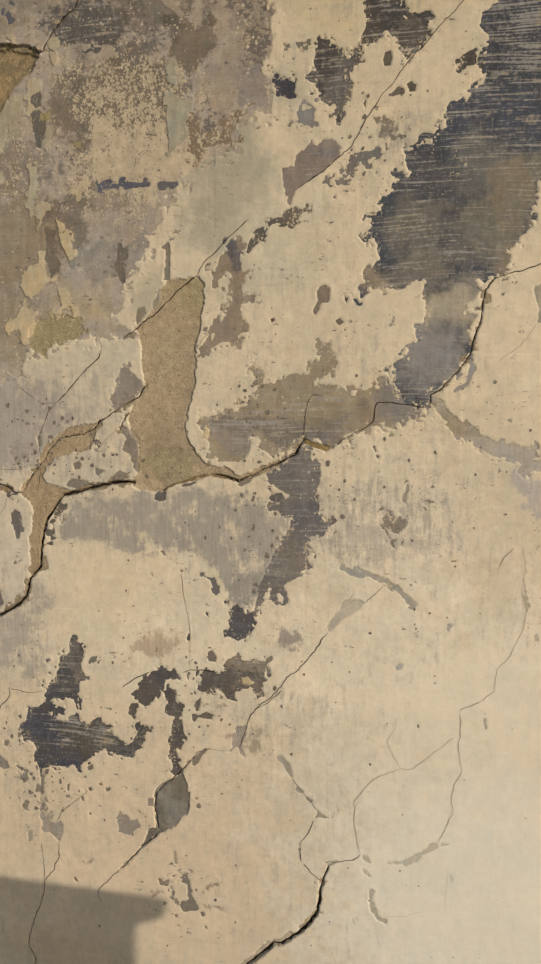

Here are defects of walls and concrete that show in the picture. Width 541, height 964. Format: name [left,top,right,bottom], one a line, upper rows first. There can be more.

crack [40,0,78,53]
crack [297,0,464,188]
crack [0,220,248,616]
crack [209,394,321,483]
peeling [0,0,541,642]
crack [334,263,541,447]
peeling [0,635,273,846]
crack [98,634,327,901]
crack [246,548,529,964]